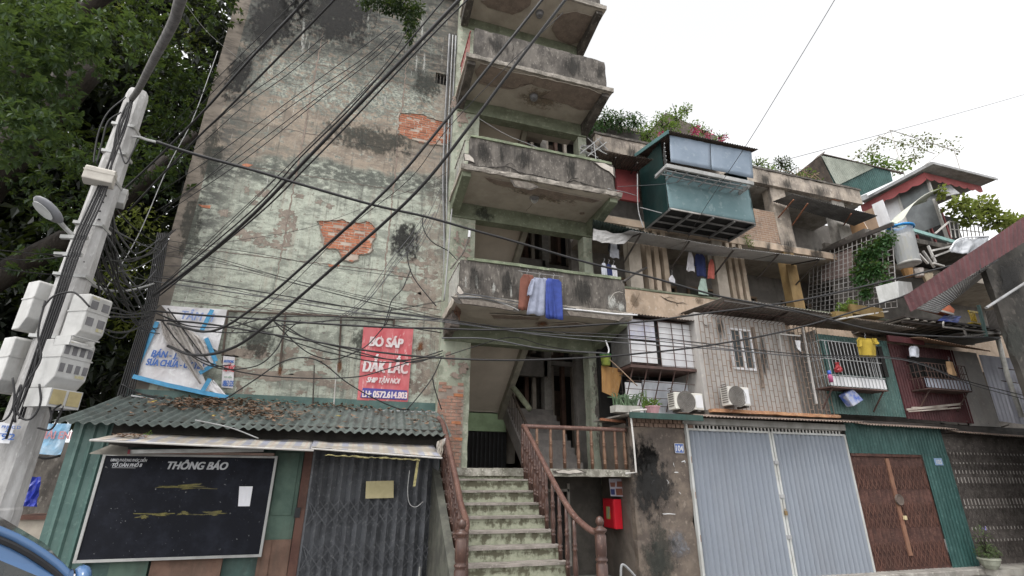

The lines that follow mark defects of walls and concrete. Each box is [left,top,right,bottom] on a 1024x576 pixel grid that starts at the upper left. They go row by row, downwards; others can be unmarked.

leakage [328,121,411,157]
spalling [397,96,470,147]
spalling [294,193,377,267]
leakage [390,224,419,260]
flaking render [409,337,469,468]
leakage [629,435,678,576]